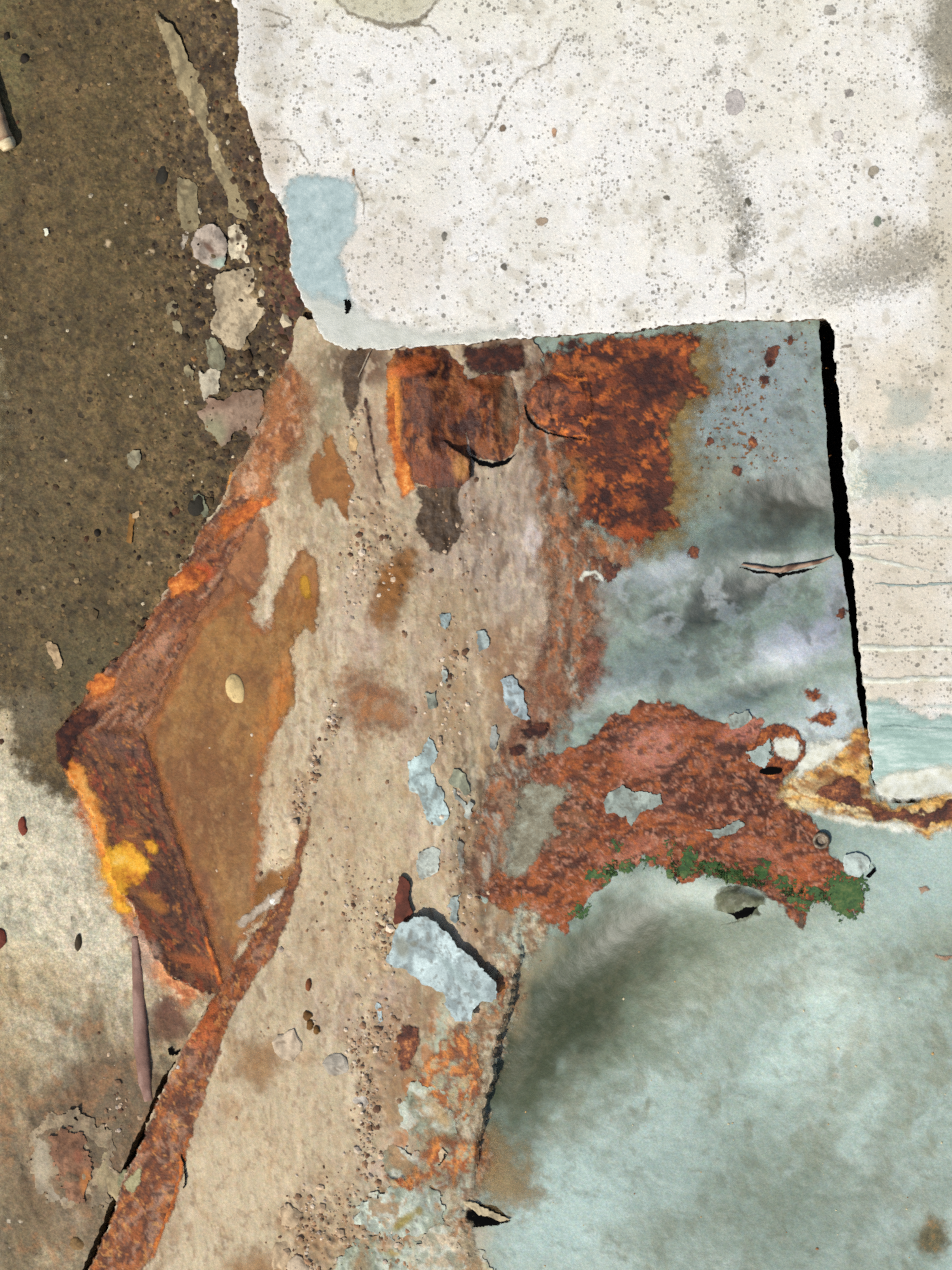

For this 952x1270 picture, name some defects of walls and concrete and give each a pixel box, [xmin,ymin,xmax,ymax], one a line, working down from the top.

leakage [0,0,314,803]
rust [386,328,719,590]
peeling [439,613,451,630]
peeling [476,630,490,652]
rust [55,363,354,1270]
peeling [386,670,869,1022]
rust [48,1126,93,1204]
crack [86,1078,168,1270]
rust [396,1025,483,1121]
rust [384,1133,543,1205]